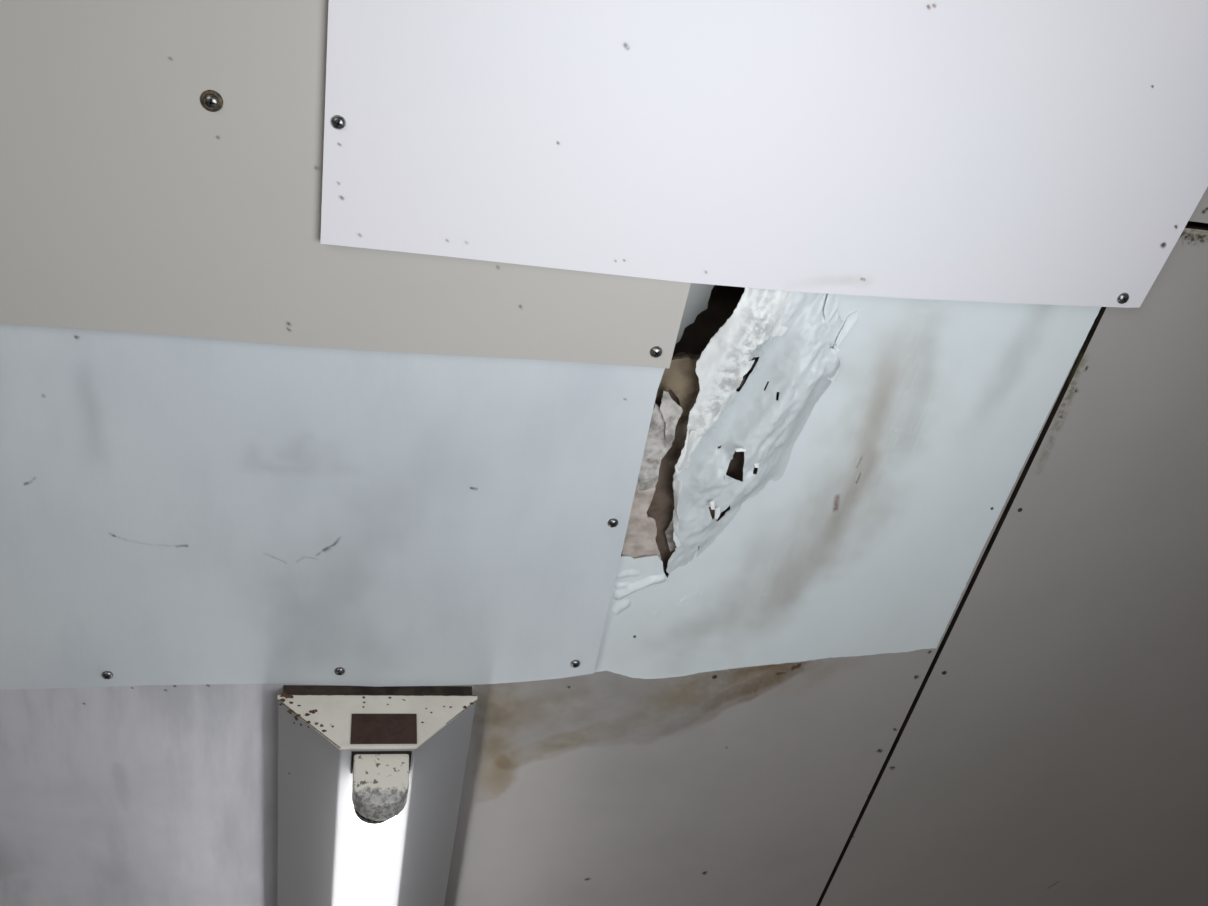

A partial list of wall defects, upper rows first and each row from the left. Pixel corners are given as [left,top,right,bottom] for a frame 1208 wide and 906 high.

spalling [622,287,795,577]